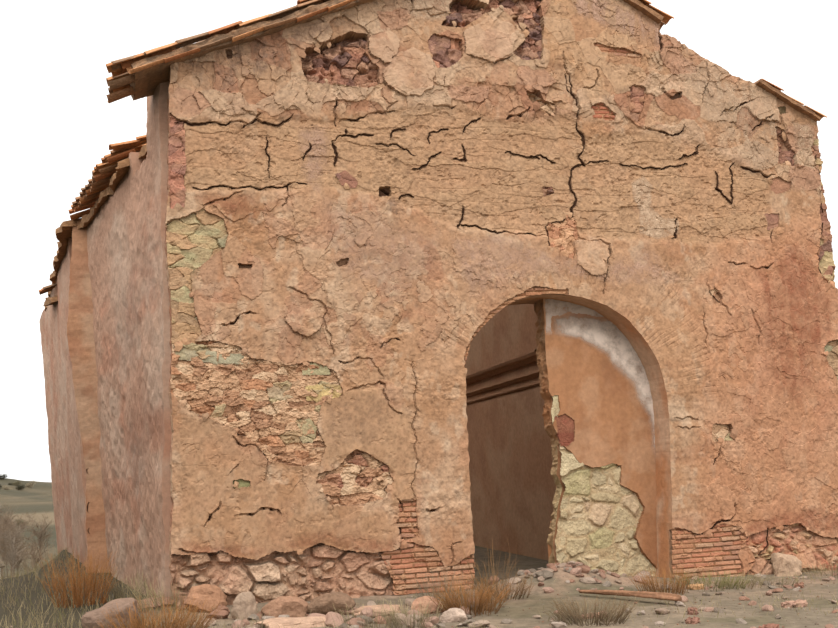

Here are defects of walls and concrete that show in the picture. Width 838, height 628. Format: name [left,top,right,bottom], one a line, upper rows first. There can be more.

spalling [297,38,378,88]
spalling [428,34,471,68]
spalling [442,0,545,63]
crack [174,118,306,205]
crack [332,101,480,169]
crack [457,68,699,246]
crack [715,163,770,204]
spalling [165,114,393,510]
leakage [545,299,654,425]
spalling [551,395,656,576]
spalling [170,498,476,610]
spalling [671,523,838,578]